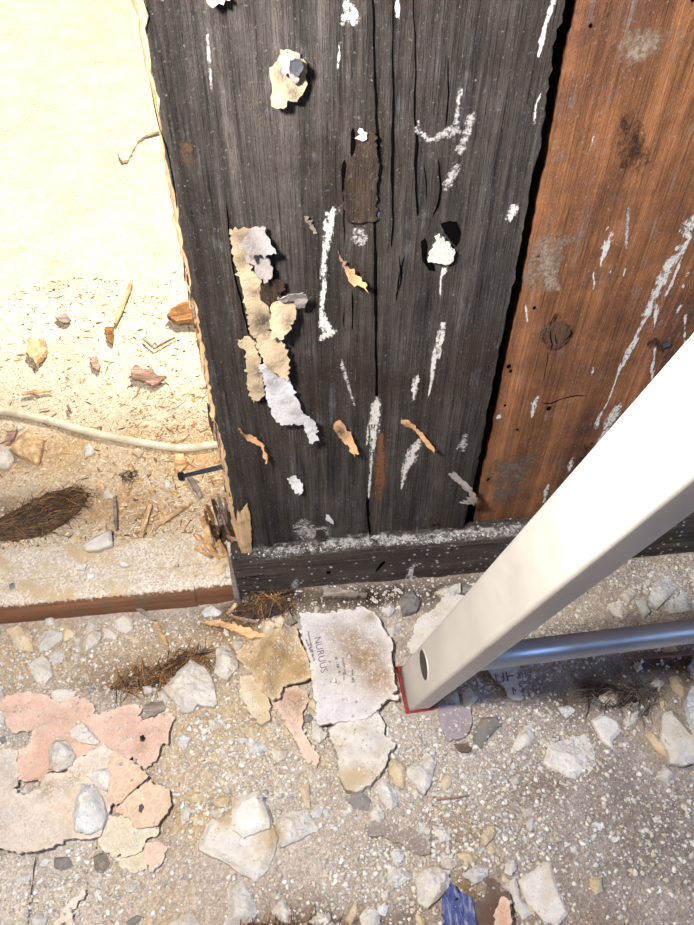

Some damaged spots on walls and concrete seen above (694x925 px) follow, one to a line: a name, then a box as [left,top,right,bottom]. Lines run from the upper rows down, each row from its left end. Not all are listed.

peeling [207,0,230,8]
peeling [269,49,308,109]
crack [443,64,451,127]
crack [343,0,442,398]
crack [366,423,376,537]